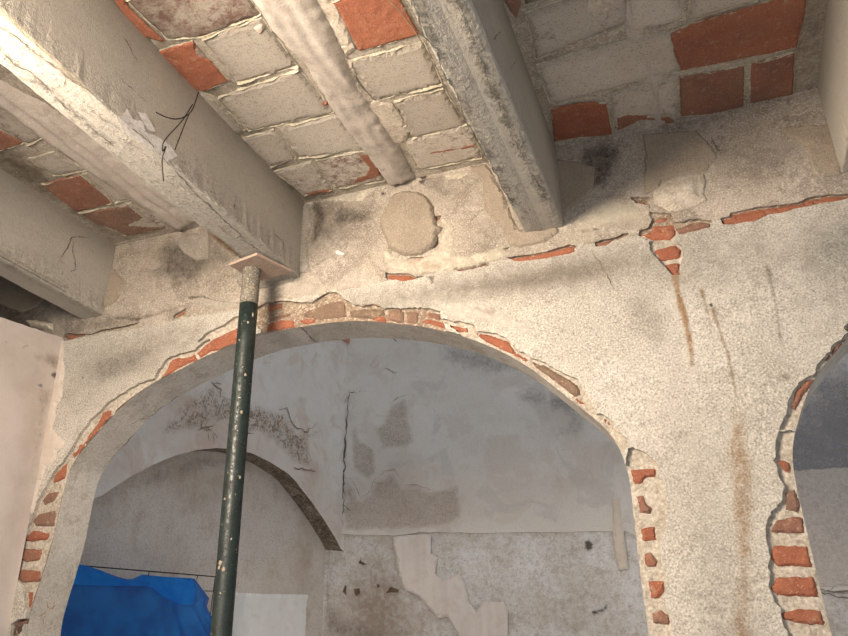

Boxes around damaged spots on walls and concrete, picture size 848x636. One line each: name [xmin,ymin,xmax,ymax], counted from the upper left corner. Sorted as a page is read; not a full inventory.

crack [0,28,259,250]
flaking render [511,246,575,261]
rust [673,276,692,352]
flaking render [640,196,848,275]
flaking render [14,318,238,636]
crack [342,391,360,522]
flaking render [248,293,673,636]
flaking render [766,324,848,636]